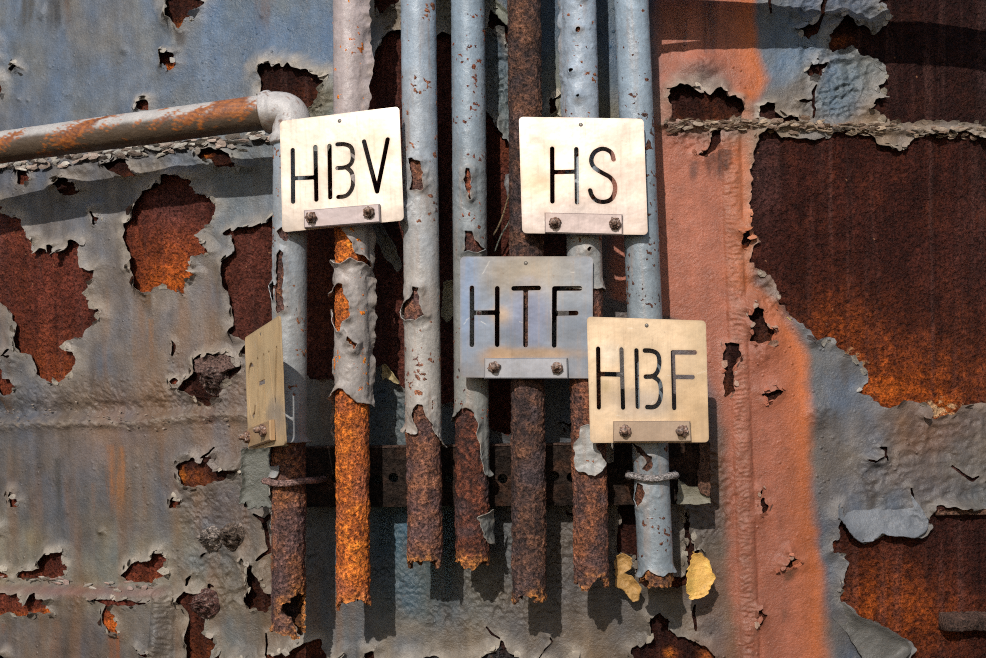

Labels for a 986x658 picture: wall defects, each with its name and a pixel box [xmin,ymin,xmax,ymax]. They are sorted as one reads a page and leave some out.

peeling [0,0,511,477]
peeling [614,0,986,435]
peeling [544,379,554,406]
peeling [162,445,242,519]
peeling [267,447,279,529]
corrosion [697,442,711,497]
peeling [751,480,783,527]
peeling [0,479,531,658]
peeling [608,443,730,658]
peeling [770,489,986,658]
peeling [556,637,598,658]
peeling [748,597,776,633]